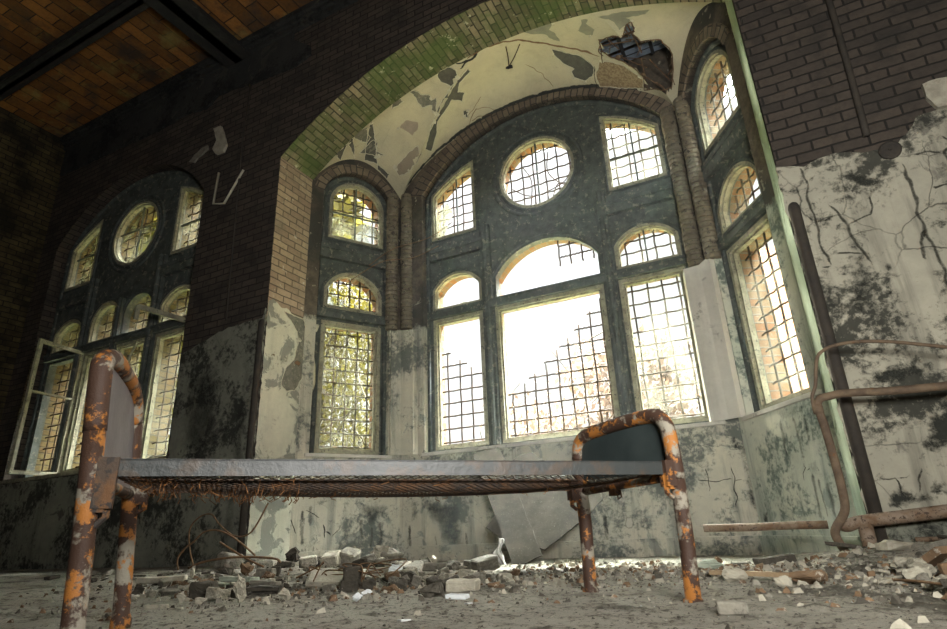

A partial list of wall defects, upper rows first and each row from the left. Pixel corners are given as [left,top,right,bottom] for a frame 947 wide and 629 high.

spalling [525,23,644,91]
spalling [335,67,471,179]
crack [800,169,873,268]
water stain [843,175,881,188]
crack [903,136,947,285]
spalling [281,311,319,391]
water stain [873,366,922,382]
water stain [360,507,382,547]
water stain [429,505,467,544]